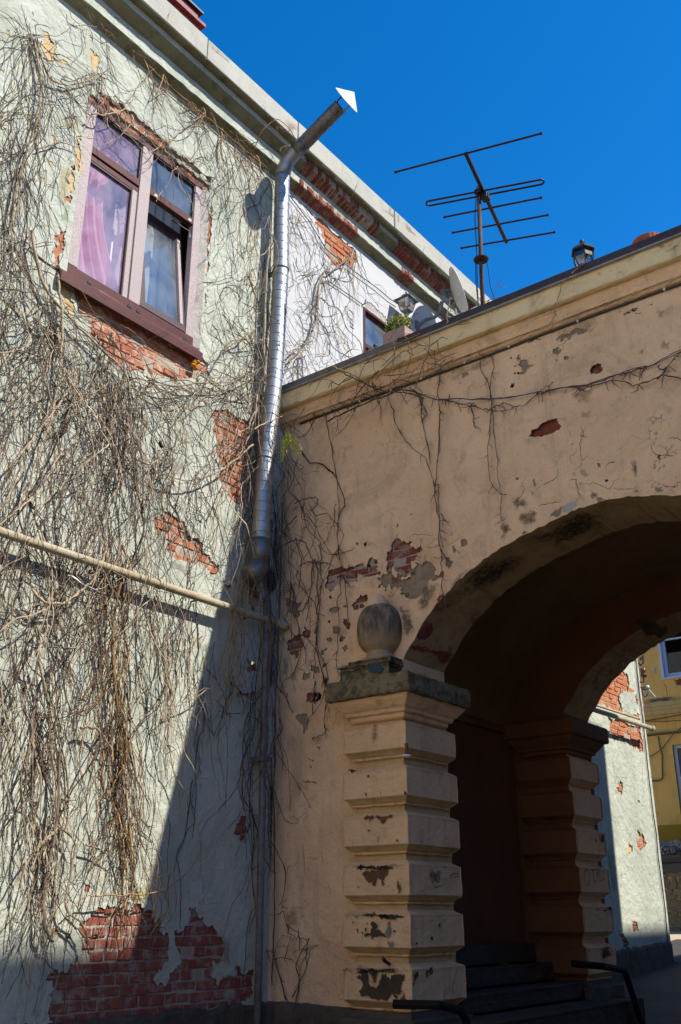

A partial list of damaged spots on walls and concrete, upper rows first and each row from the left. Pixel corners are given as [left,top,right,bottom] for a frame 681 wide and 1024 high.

flaking render [292,158,380,272]
spalling [52,227,212,384]
spalling [211,409,250,510]
spalling [529,418,561,437]
spalling [153,511,231,590]
peeling [286,524,468,735]
spalling [598,671,644,752]
peeling [357,864,401,894]
spalling [627,830,646,854]
spalling [45,901,254,1024]
peeling [352,914,404,947]
peeling [343,967,433,1001]